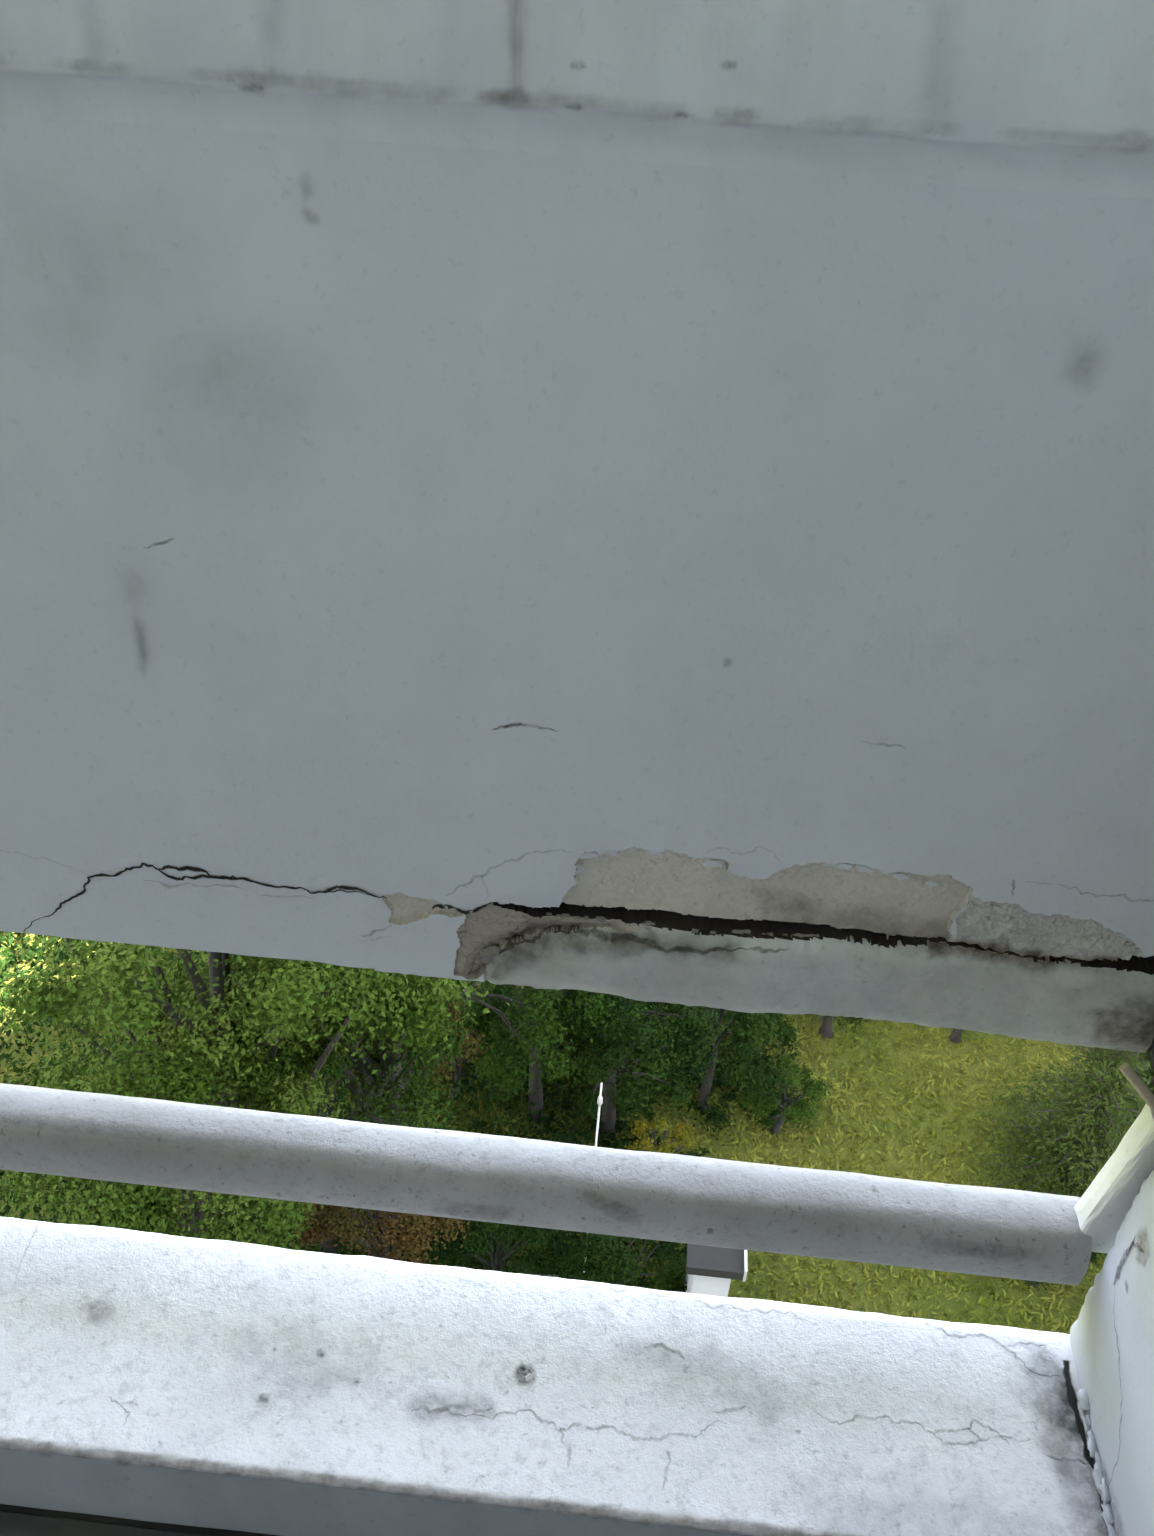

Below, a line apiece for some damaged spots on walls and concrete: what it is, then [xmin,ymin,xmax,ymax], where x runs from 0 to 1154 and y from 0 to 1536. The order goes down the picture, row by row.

crack [23,863,387,934]
peeling [382,846,973,980]